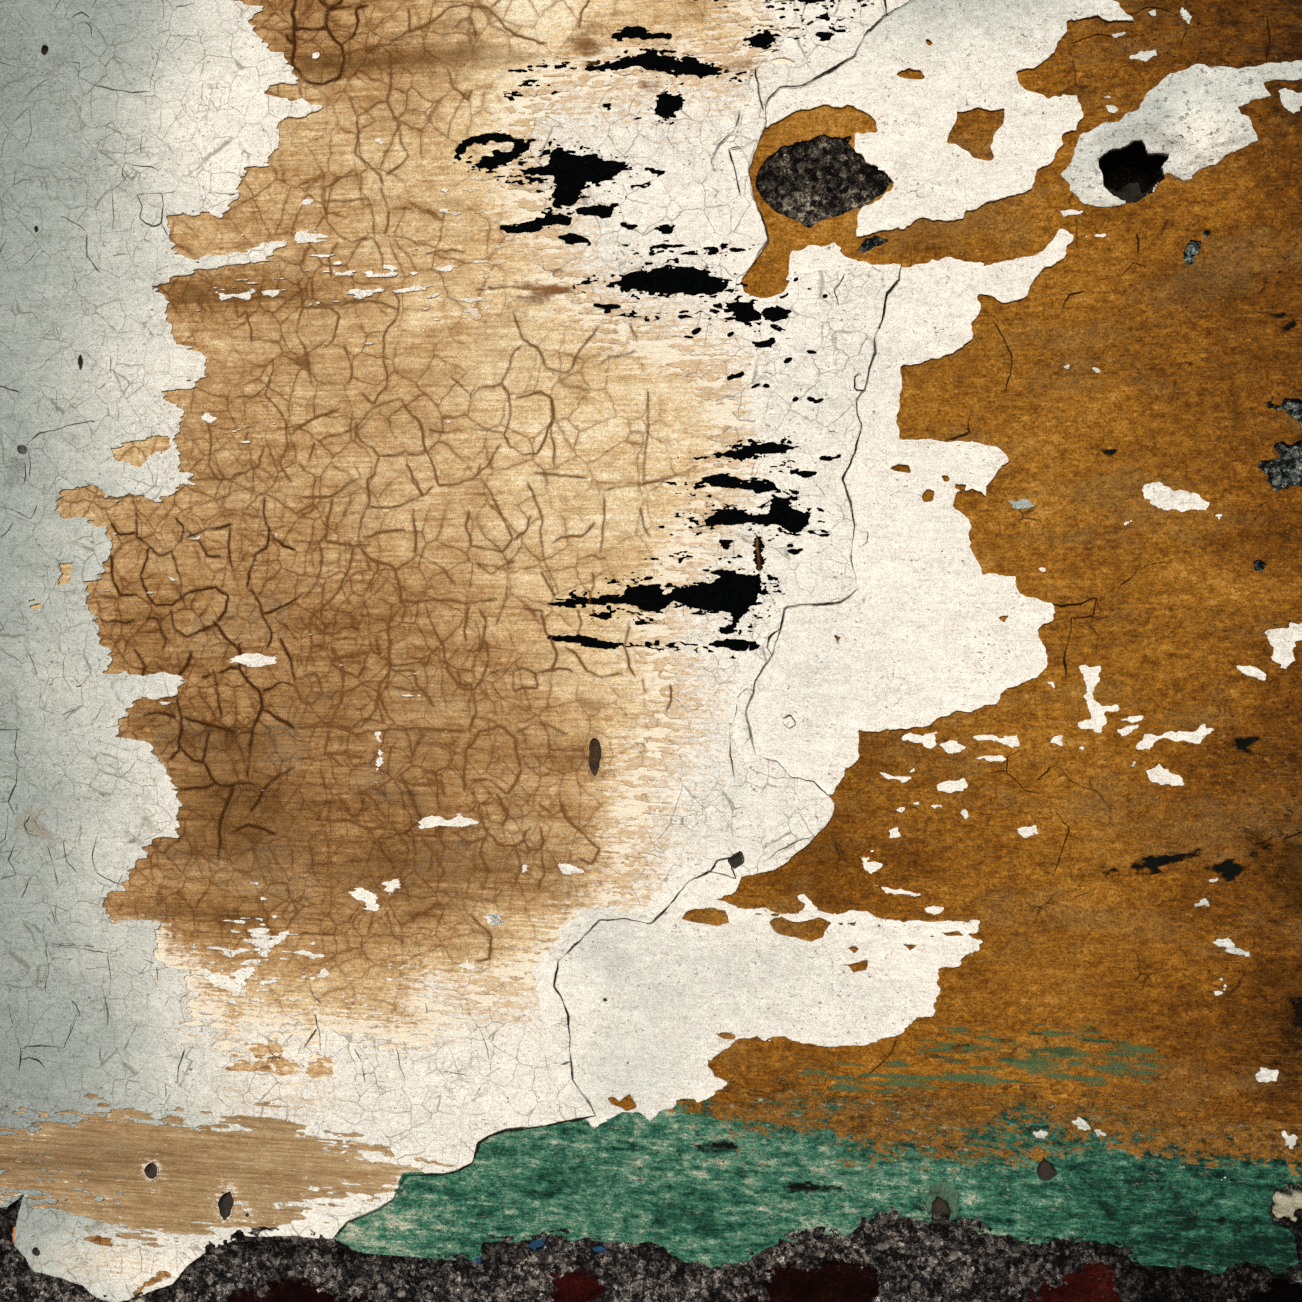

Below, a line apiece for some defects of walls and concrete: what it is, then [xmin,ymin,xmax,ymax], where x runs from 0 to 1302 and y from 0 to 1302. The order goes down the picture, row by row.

crack [2,0,175,273]
crack [713,0,912,274]
crack [101,0,672,935]
peeling [55,0,800,1078]
crack [729,264,902,796]
crack [944,420,971,441]
peeling [682,0,1302,1149]
crack [994,323,1013,393]
crack [987,749,1070,871]
flaking render [0,1094,1302,1302]